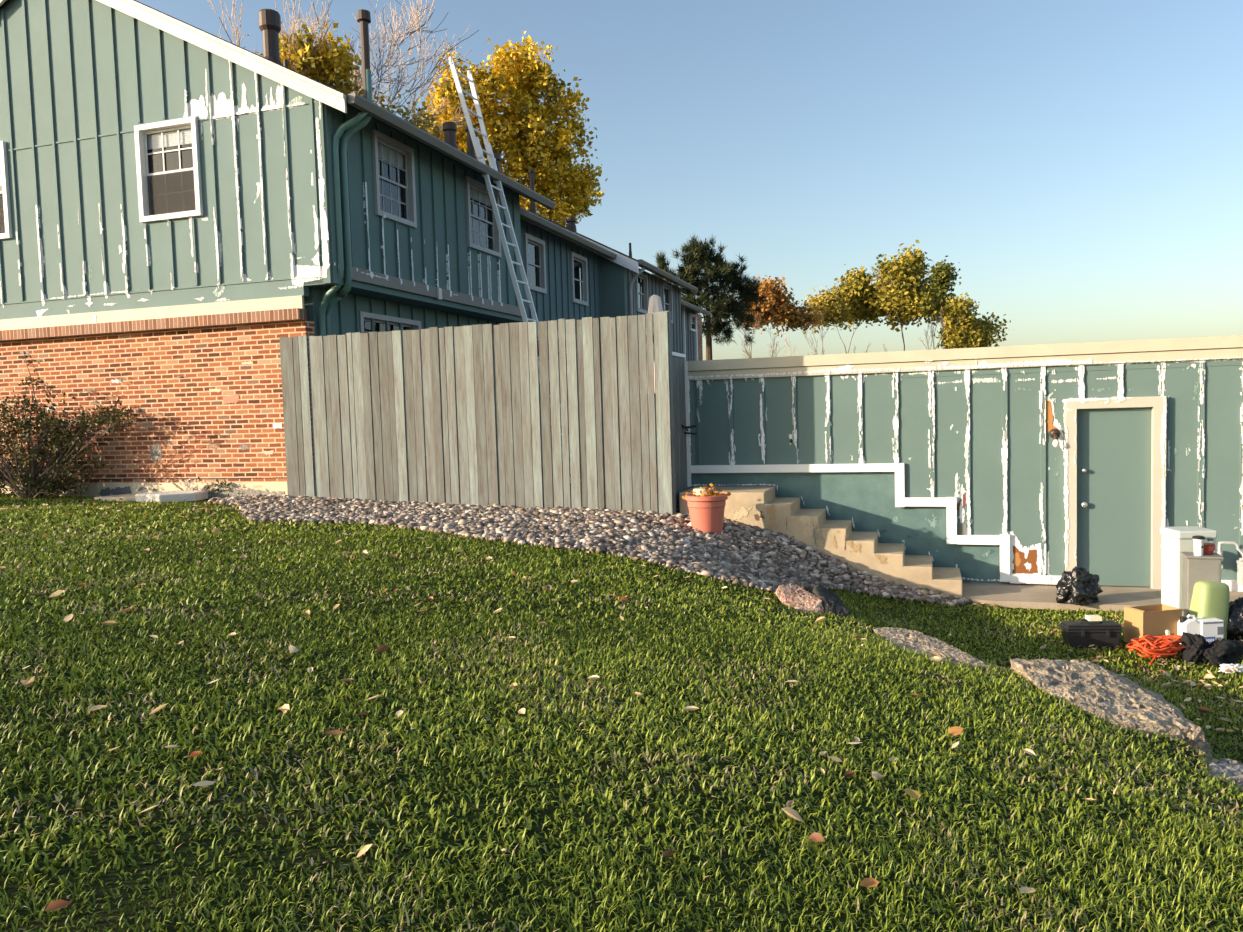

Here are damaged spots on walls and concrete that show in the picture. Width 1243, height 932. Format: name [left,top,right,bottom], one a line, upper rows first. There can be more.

peeling [1046,401,1058,432]